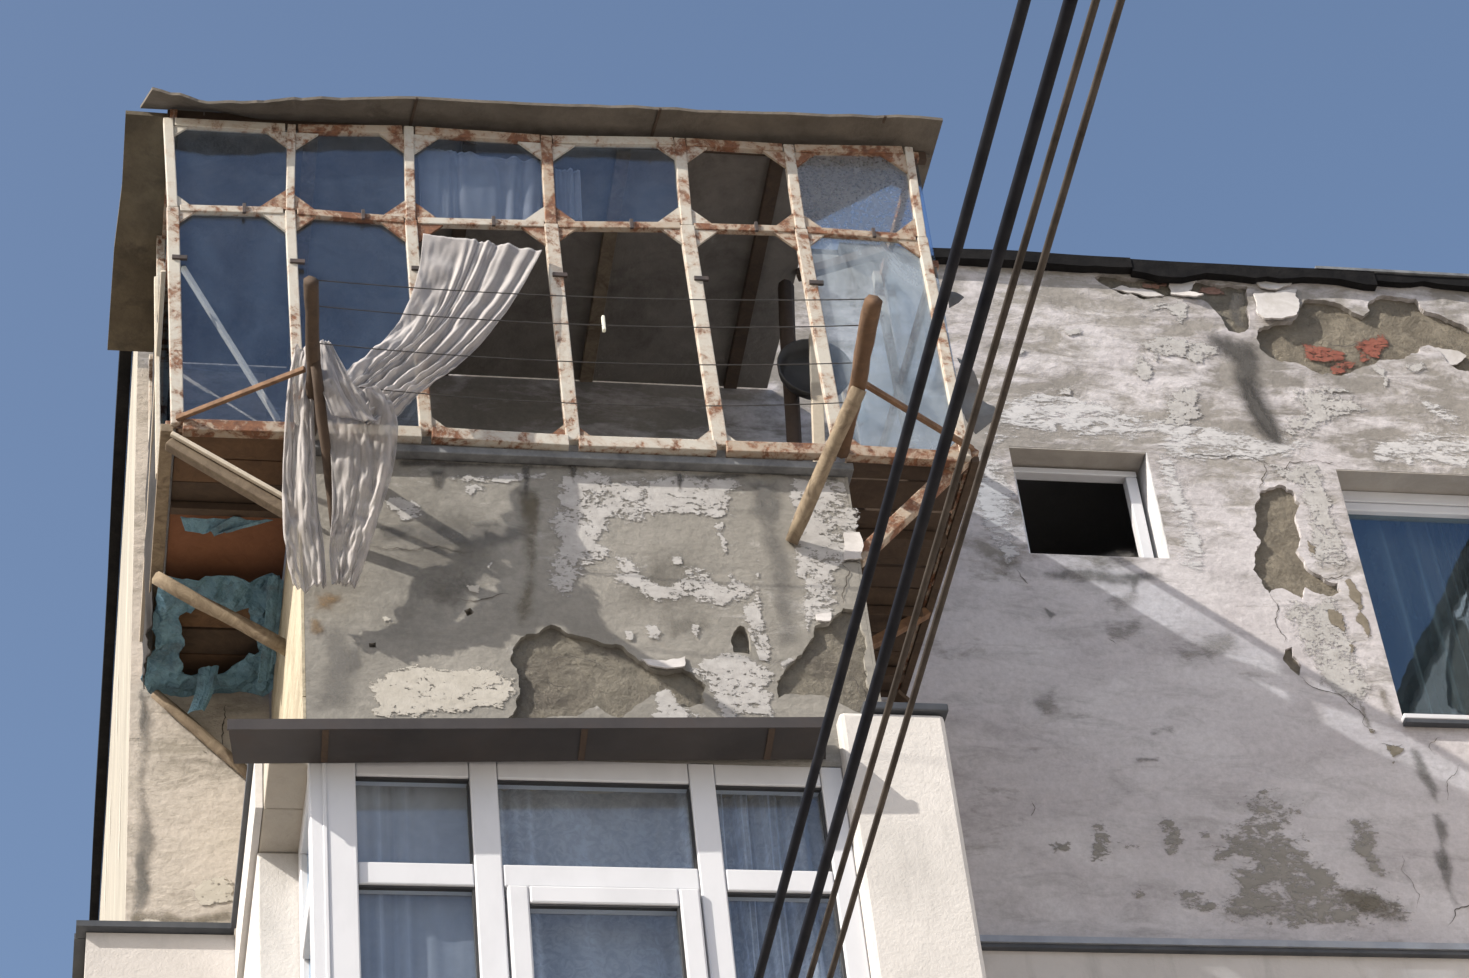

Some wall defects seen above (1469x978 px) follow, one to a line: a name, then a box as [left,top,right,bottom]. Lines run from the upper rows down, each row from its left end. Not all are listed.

water stain [1209,293,1278,441]
spalling [977,277,1469,705]
spalling [369,469,868,718]
peeling [1091,824,1139,862]
peeling [1160,789,1411,930]